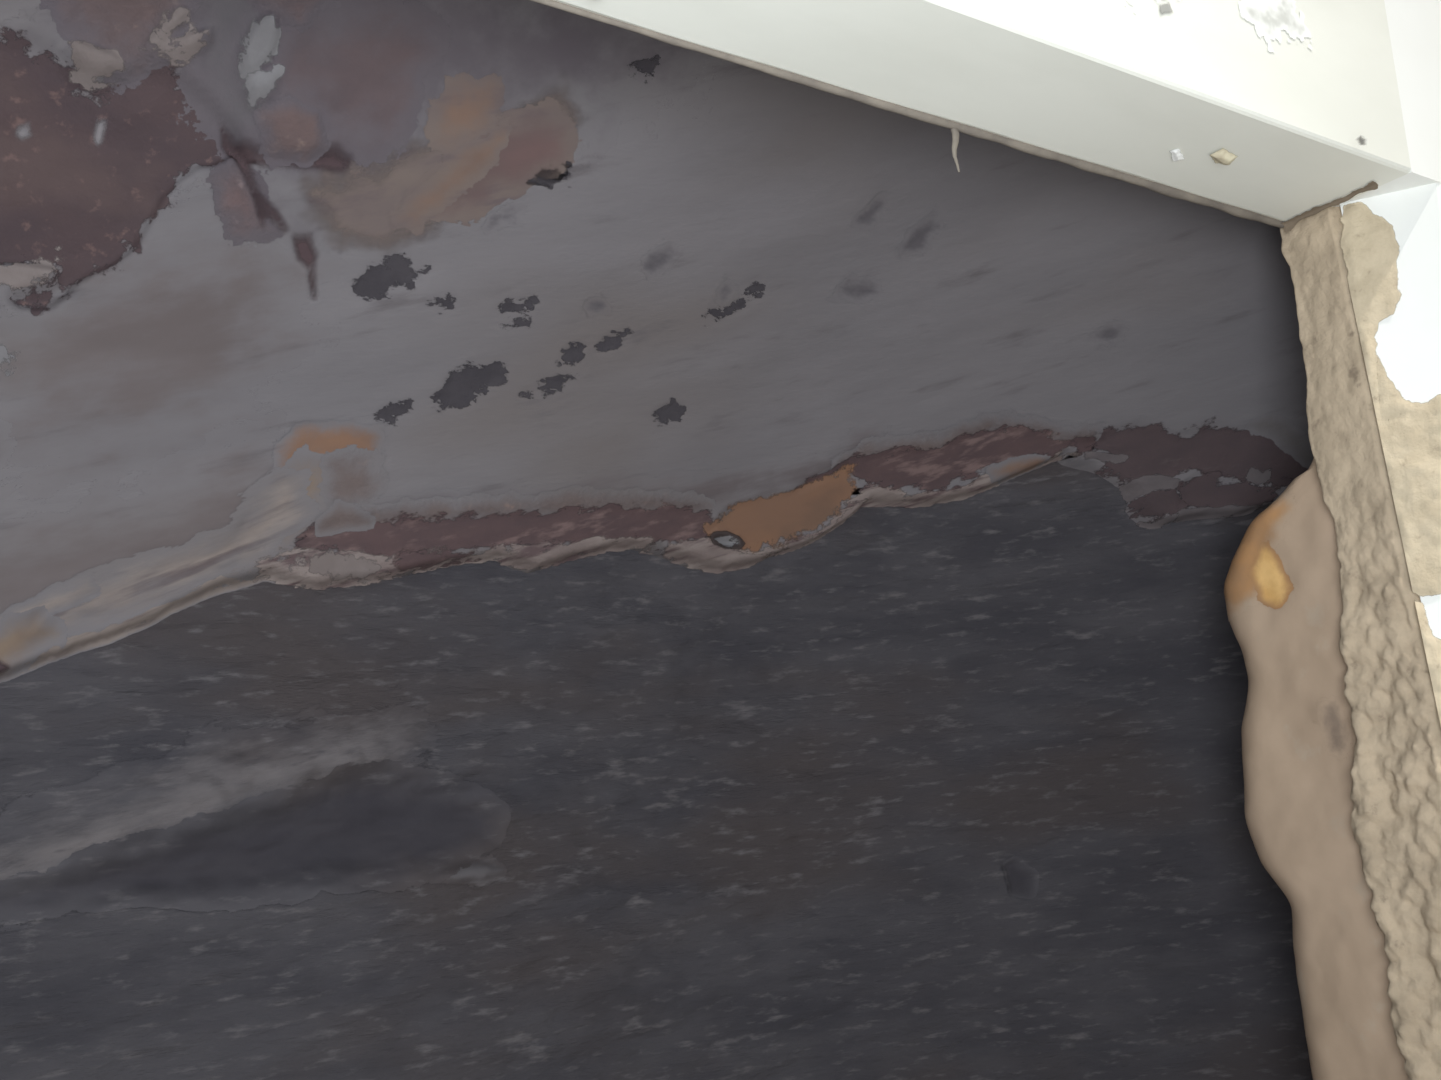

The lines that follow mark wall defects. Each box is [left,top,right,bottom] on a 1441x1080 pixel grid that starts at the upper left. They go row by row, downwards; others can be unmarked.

peeling [0,0,456,316]
spalling [526,161,572,189]
leakage [0,0,717,614]
spalling [498,295,540,327]
spalling [641,238,683,281]
spalling [701,281,766,322]
spalling [374,328,635,426]
spalling [652,398,687,427]
peeling [0,409,1106,683]
rust [703,464,856,566]
spalling [1084,202,1441,1080]
spalling [0,759,512,925]